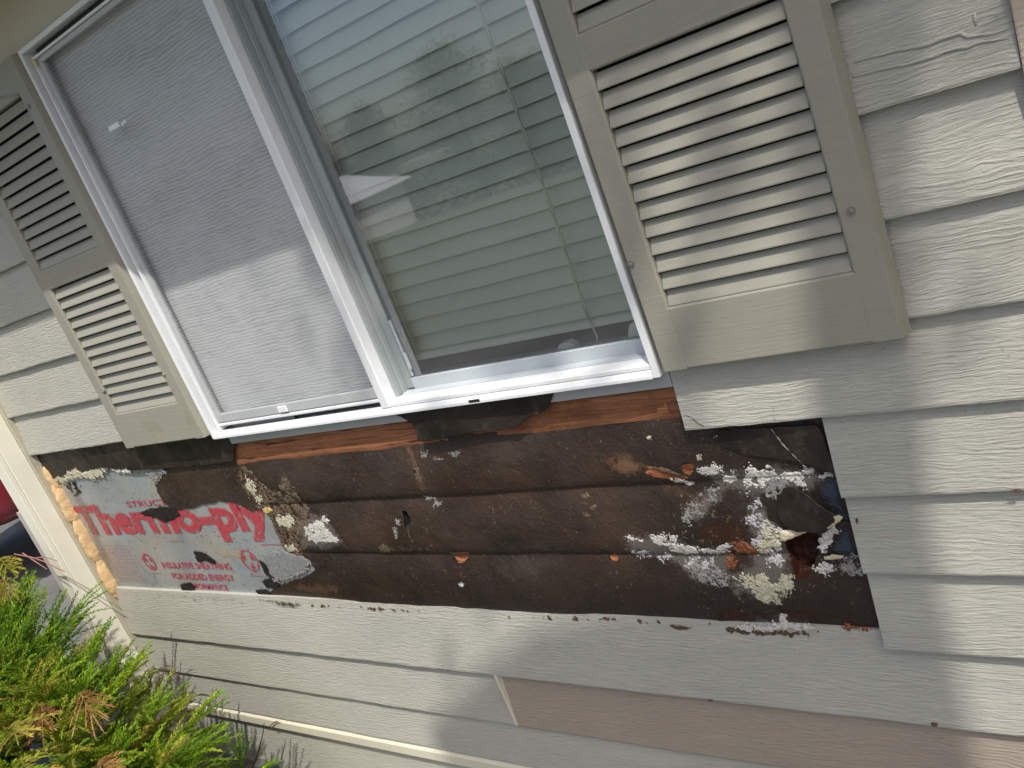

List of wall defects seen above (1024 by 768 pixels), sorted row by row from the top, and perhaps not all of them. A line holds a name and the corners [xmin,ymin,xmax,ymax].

peeling [54,467,131,484]
peeling [144,468,168,484]
peeling [139,506,180,522]
peeling [237,464,339,595]
peeling [378,519,402,553]
water stain [702,522,746,548]
peeling [625,425,863,638]
peeling [193,551,216,565]